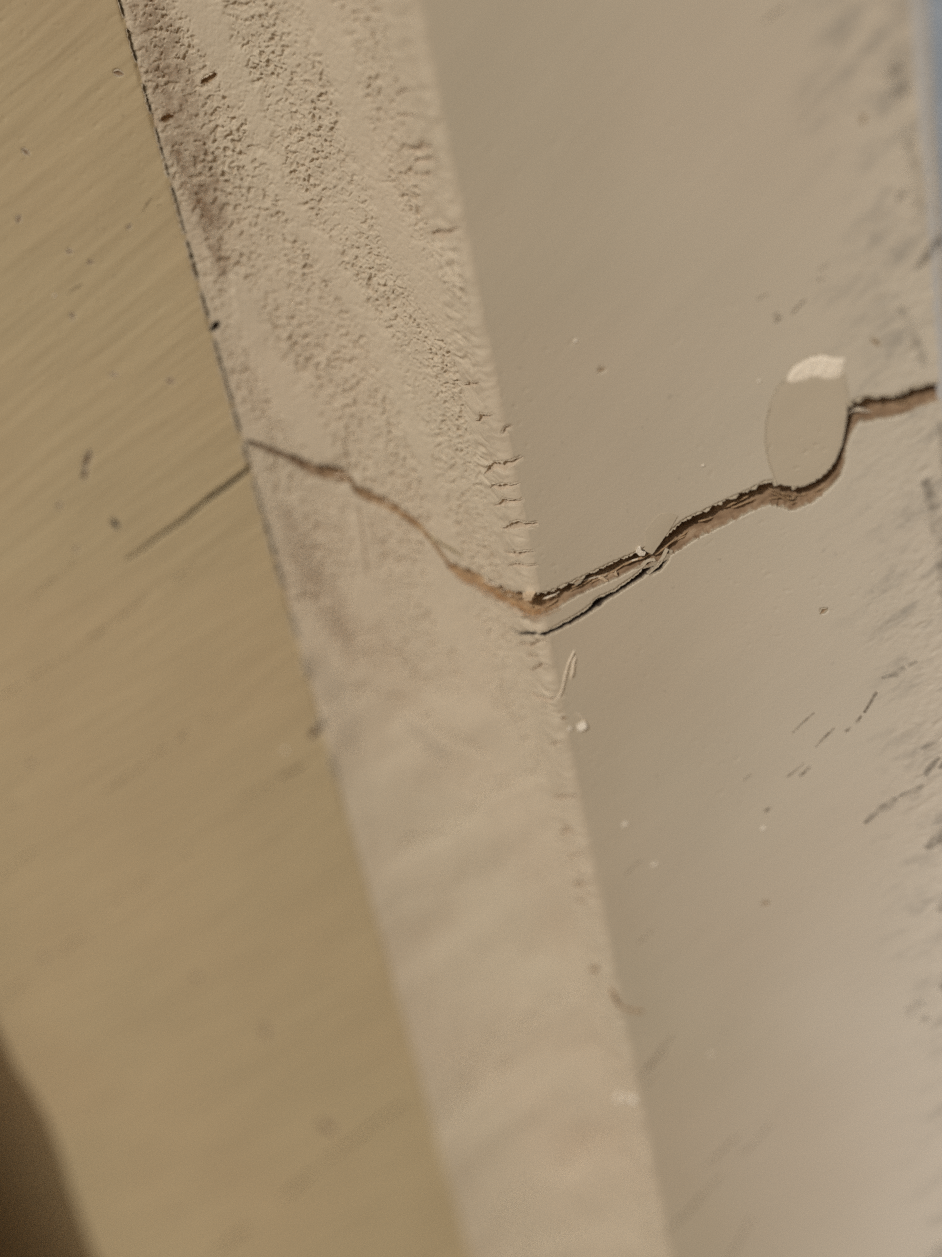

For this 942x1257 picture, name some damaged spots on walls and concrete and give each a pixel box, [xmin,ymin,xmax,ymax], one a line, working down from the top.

crack [117,0,942,678]
peeling [764,353,853,486]